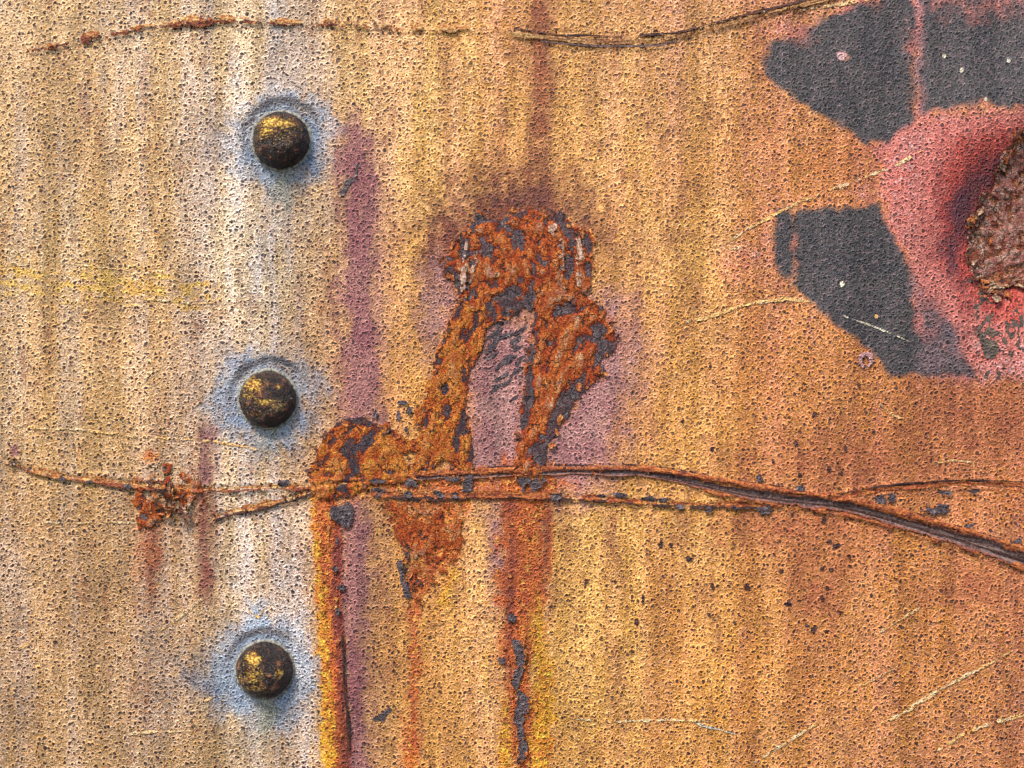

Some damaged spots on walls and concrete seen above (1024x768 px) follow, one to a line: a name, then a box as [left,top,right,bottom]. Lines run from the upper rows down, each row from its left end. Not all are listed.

crack [24,0,827,51]
rust [304,0,1024,768]
crack [8,461,313,522]
crack [337,463,1024,571]
rust [0,407,230,740]